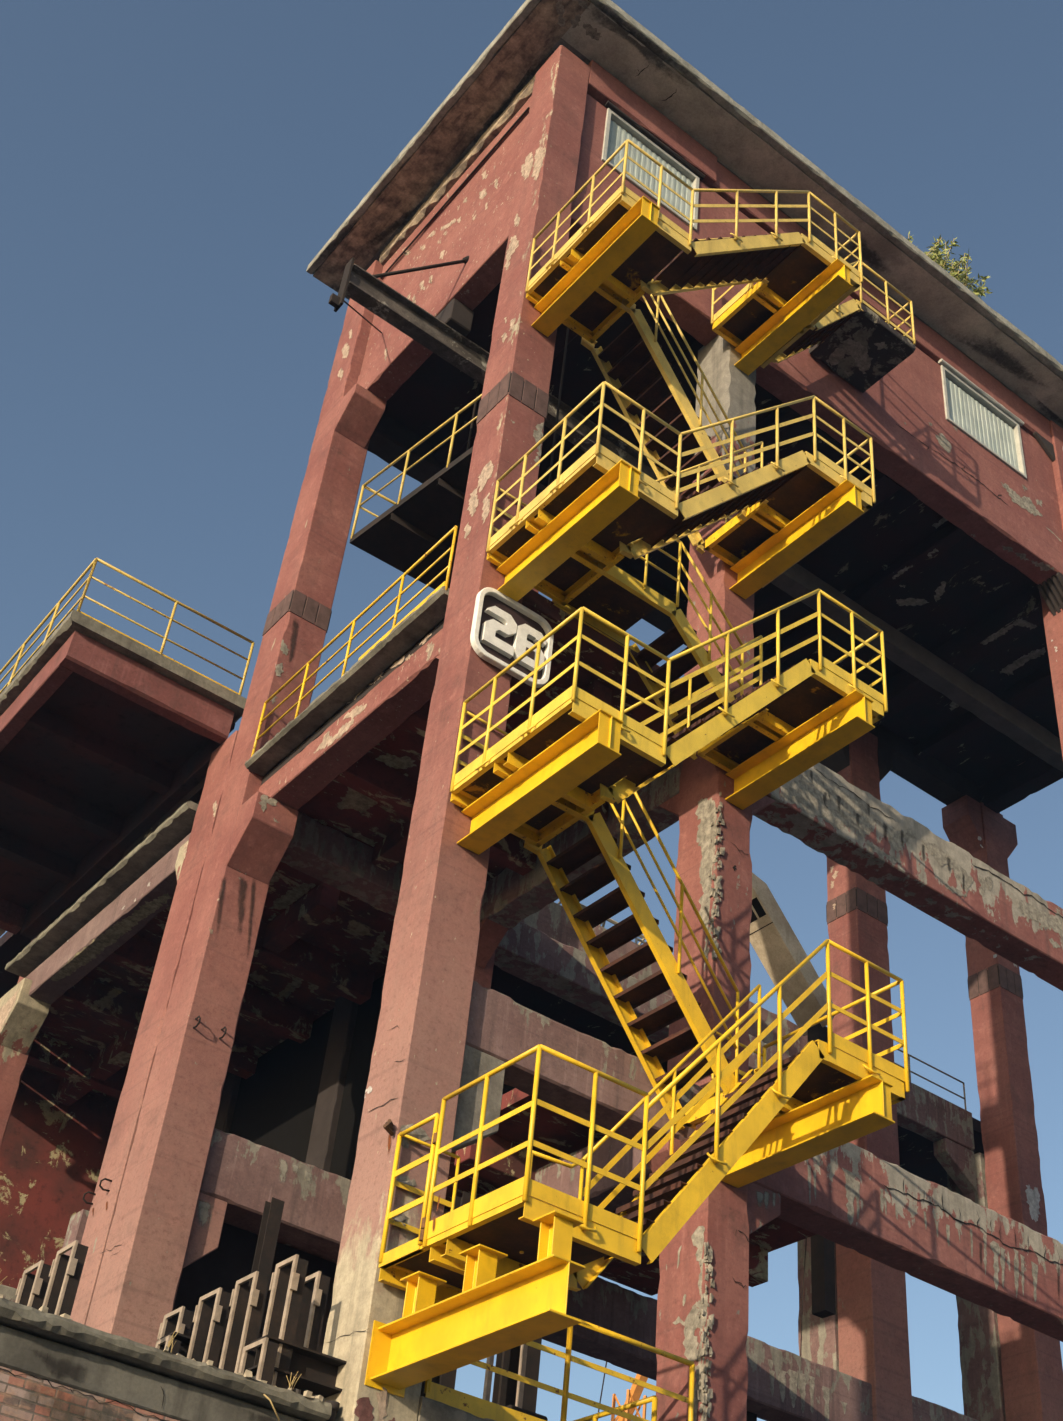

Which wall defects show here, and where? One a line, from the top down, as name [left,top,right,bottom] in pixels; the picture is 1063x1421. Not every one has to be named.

peeling [521,137,545,180]
peeling [402,171,499,259]
peeling [504,214,520,270]
peeling [338,329,352,380]
spalling [826,338,888,377]
peeling [781,773,993,898]
peeling [842,1168,860,1225]
crack [884,1179,1063,1265]
peeling [1025,1185,1040,1222]
peeling [924,1211,1045,1302]
spalling [666,1226,715,1421]